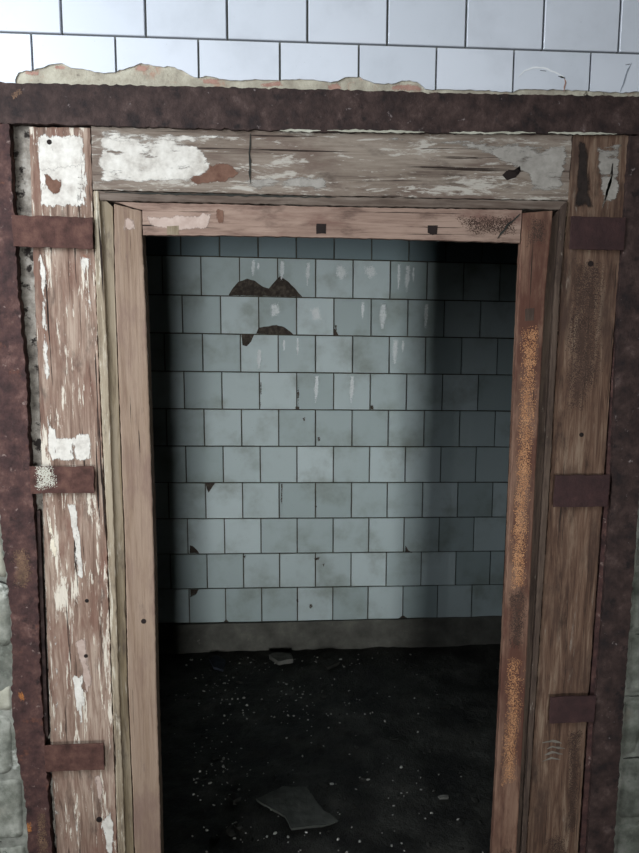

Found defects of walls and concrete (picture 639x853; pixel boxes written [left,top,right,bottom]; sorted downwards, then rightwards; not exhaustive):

spalling [16,64,639,97]
peeling [37,134,87,207]
peeling [99,132,217,182]
spalling [229,276,302,297]
spalling [242,325,293,346]
peeling [68,504,83,578]
spalling [0,516,29,853]
peeling [73,639,92,724]
spalling [614,508,639,853]
peeling [101,813,113,853]